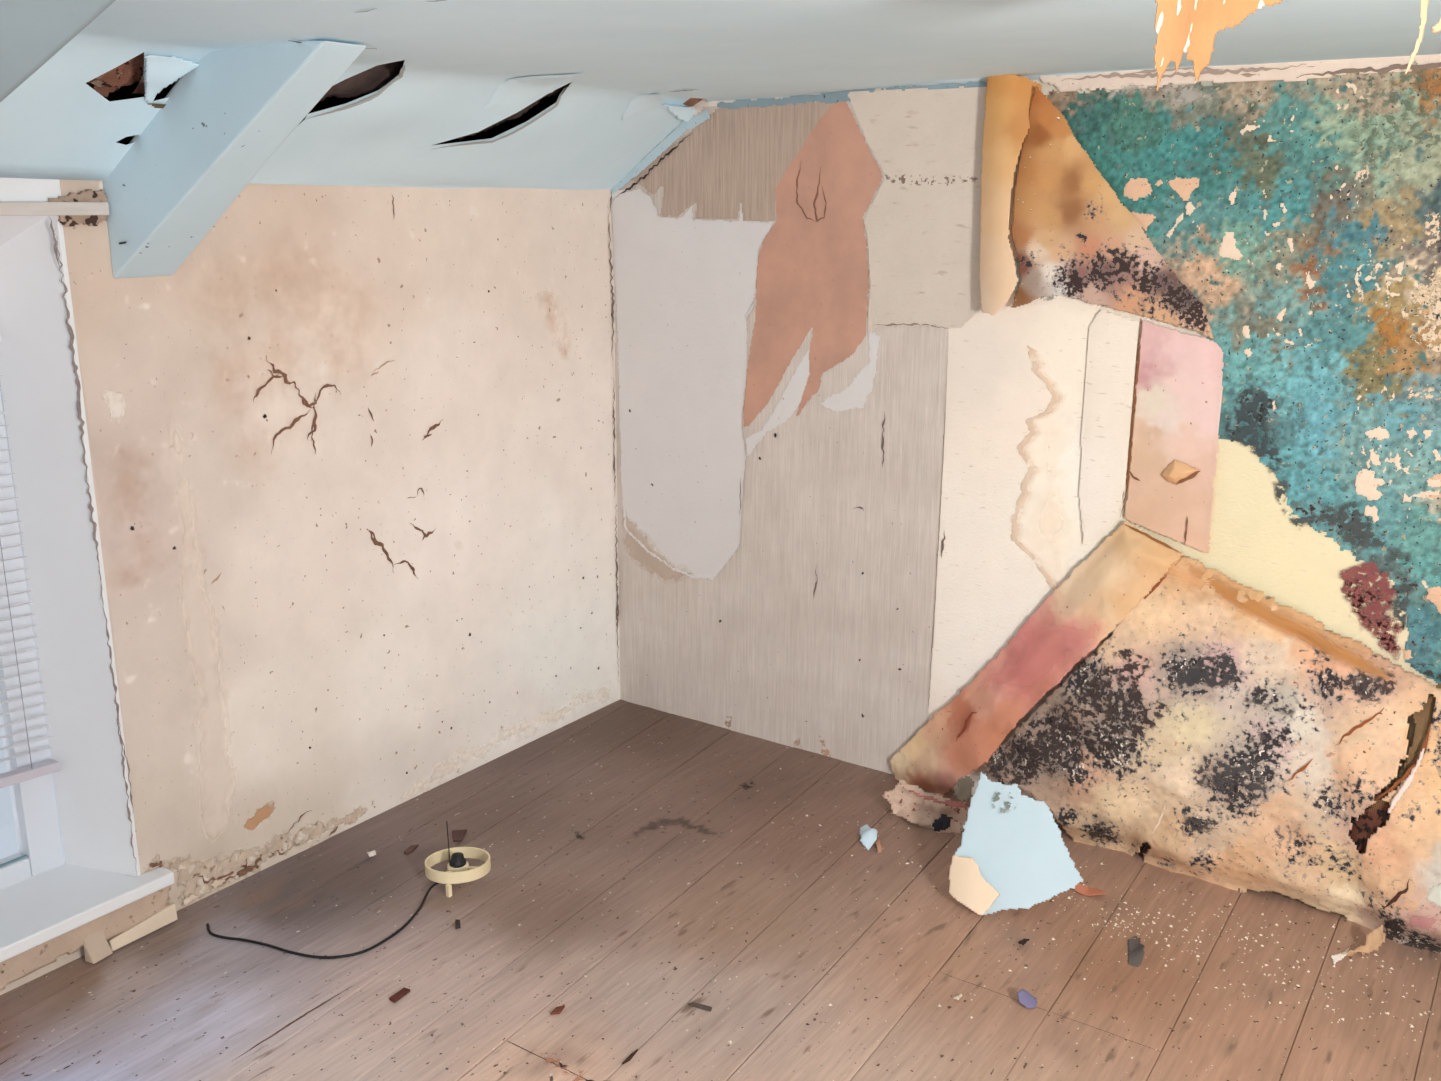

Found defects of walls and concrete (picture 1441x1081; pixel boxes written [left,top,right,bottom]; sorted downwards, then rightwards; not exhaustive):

peeling [663,104,696,122]
flaking render [743,101,882,427]
peeling [979,0,1441,684]
crack [253,355,395,454]
crack [367,488,434,577]
mould [985,649,1171,790]
mould [1175,653,1238,688]
mould [1245,692,1294,715]
mould [1192,731,1266,801]
spalling [149,808,366,906]
mould [1181,817,1219,835]
mould [1384,884,1441,953]